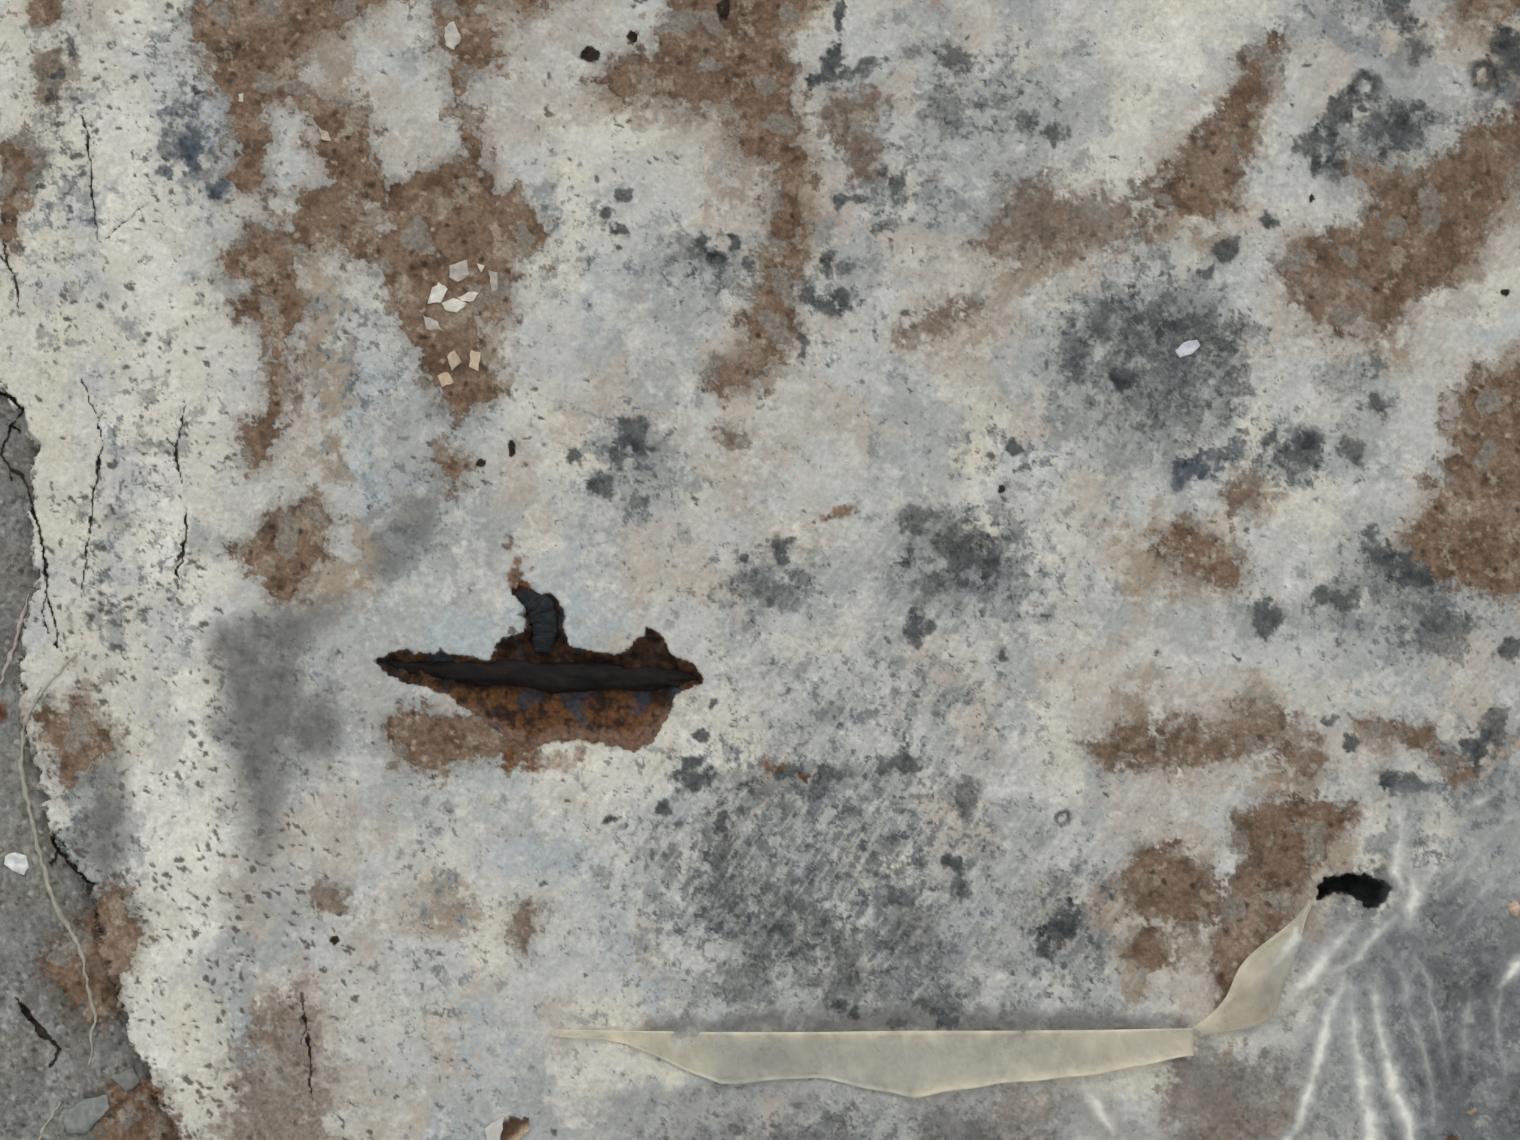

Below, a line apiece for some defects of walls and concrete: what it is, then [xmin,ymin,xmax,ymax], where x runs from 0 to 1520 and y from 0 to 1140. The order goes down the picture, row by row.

peeling [0,0,80,256]
spalling [372,585,703,788]
peeling [21,689,130,797]
corrosion [501,747,536,771]
peeling [4,852,29,875]
peeling [1075,698,1363,1030]
peeling [26,873,154,1043]
peeling [91,1066,191,1140]
spalling [500,1116,530,1140]
peeling [1156,1045,1303,1140]